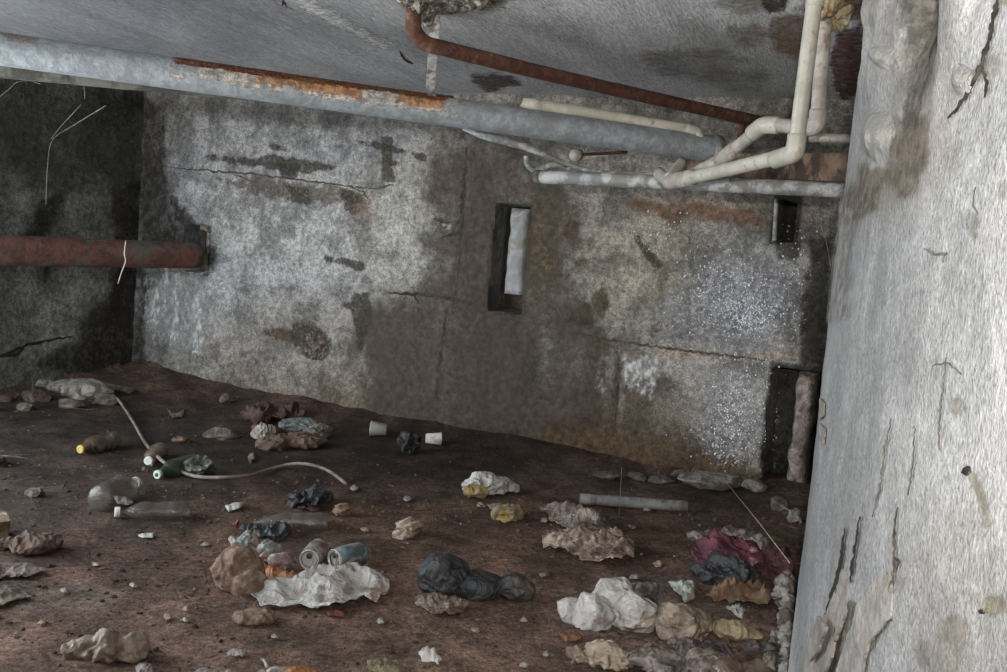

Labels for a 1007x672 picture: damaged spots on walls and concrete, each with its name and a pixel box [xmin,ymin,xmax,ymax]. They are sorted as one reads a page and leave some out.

rust [173,57,454,108]
crack [947,0,999,119]
water stain [206,143,364,214]
crack [0,336,73,358]
water stain [111,268,208,361]
flaking render [800,568,894,672]